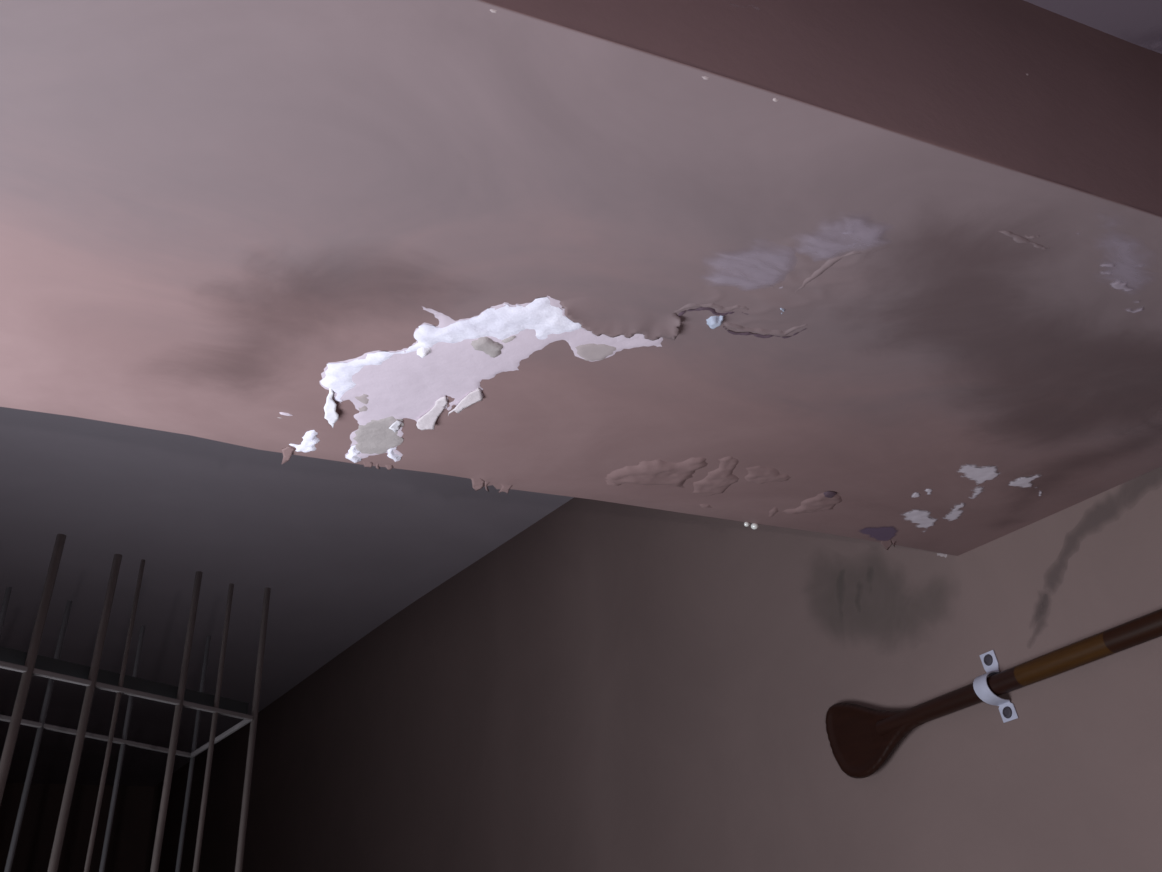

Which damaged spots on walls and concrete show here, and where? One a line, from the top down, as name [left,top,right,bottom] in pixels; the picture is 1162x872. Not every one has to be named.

peeling [319,296,681,470]
peeling [281,430,320,465]
water stain [861,465,999,541]
water stain [1009,475,1042,496]